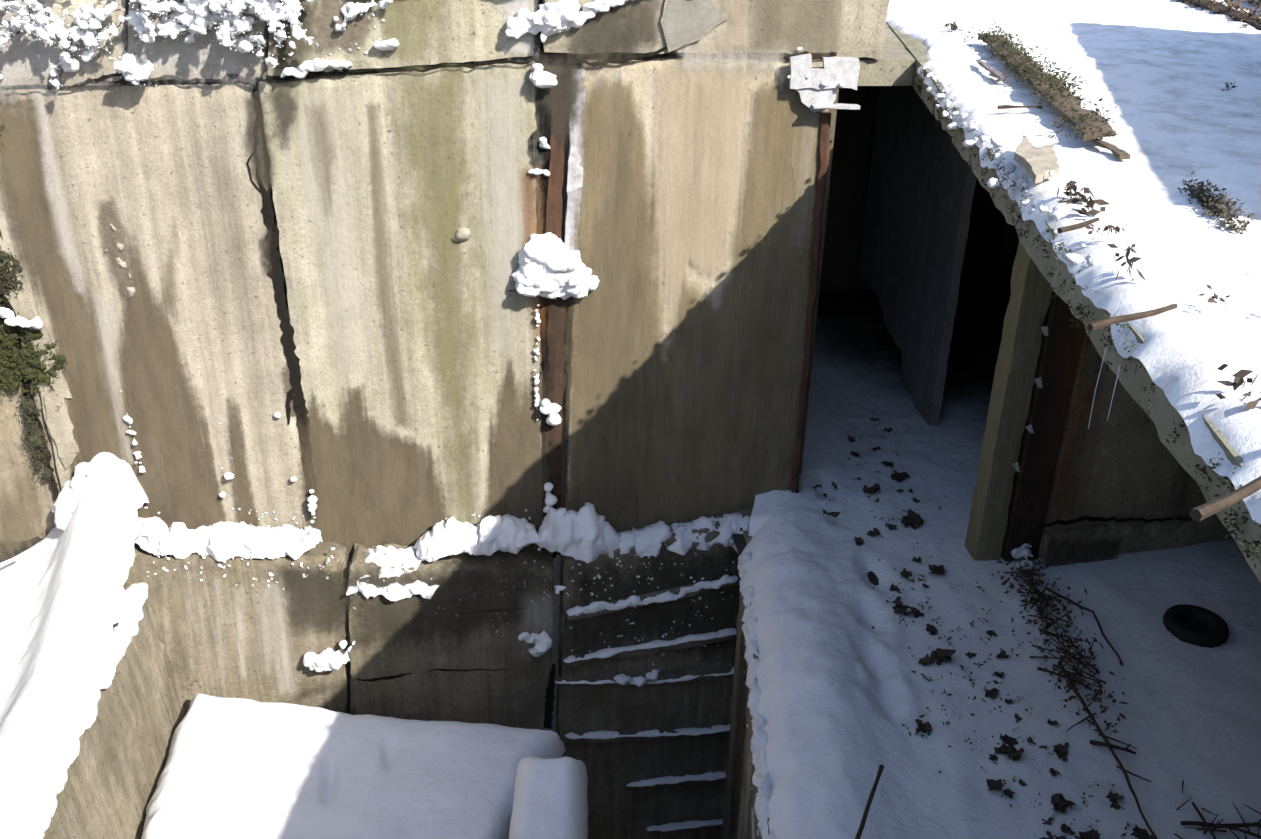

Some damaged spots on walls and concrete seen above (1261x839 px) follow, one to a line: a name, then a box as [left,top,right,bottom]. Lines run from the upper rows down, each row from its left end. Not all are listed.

crack [572,46,837,67]
damp [0,94,259,529]
crack [0,58,551,503]
rust [525,174,537,242]
crack [538,295,557,509]
damp [567,65,824,532]
rust [790,112,831,493]
crack [356,669,510,682]
crack [543,664,556,728]